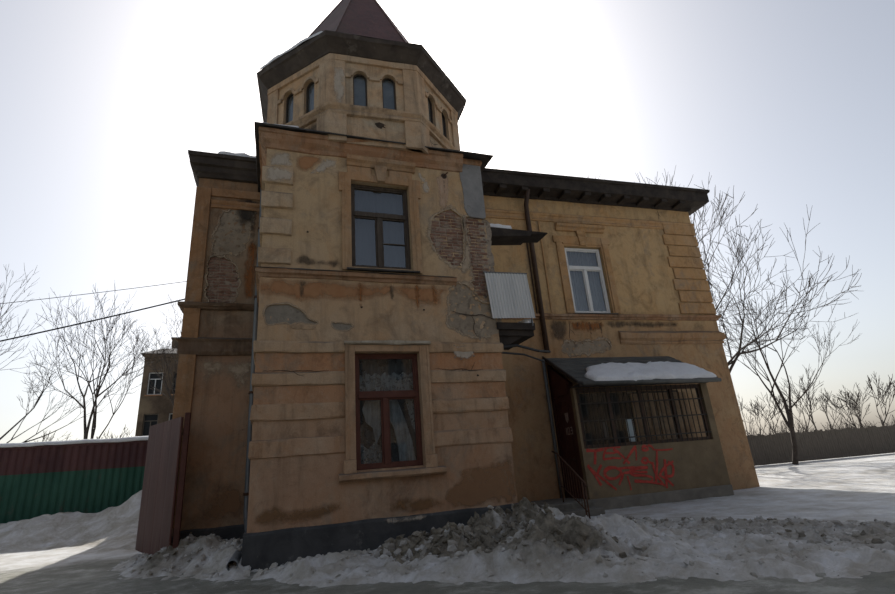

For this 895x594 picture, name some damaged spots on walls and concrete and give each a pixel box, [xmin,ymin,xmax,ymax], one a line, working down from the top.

peeling [427,205,502,340]
spalling [263,302,318,330]
damp [446,460,516,507]
damp [257,505,337,524]